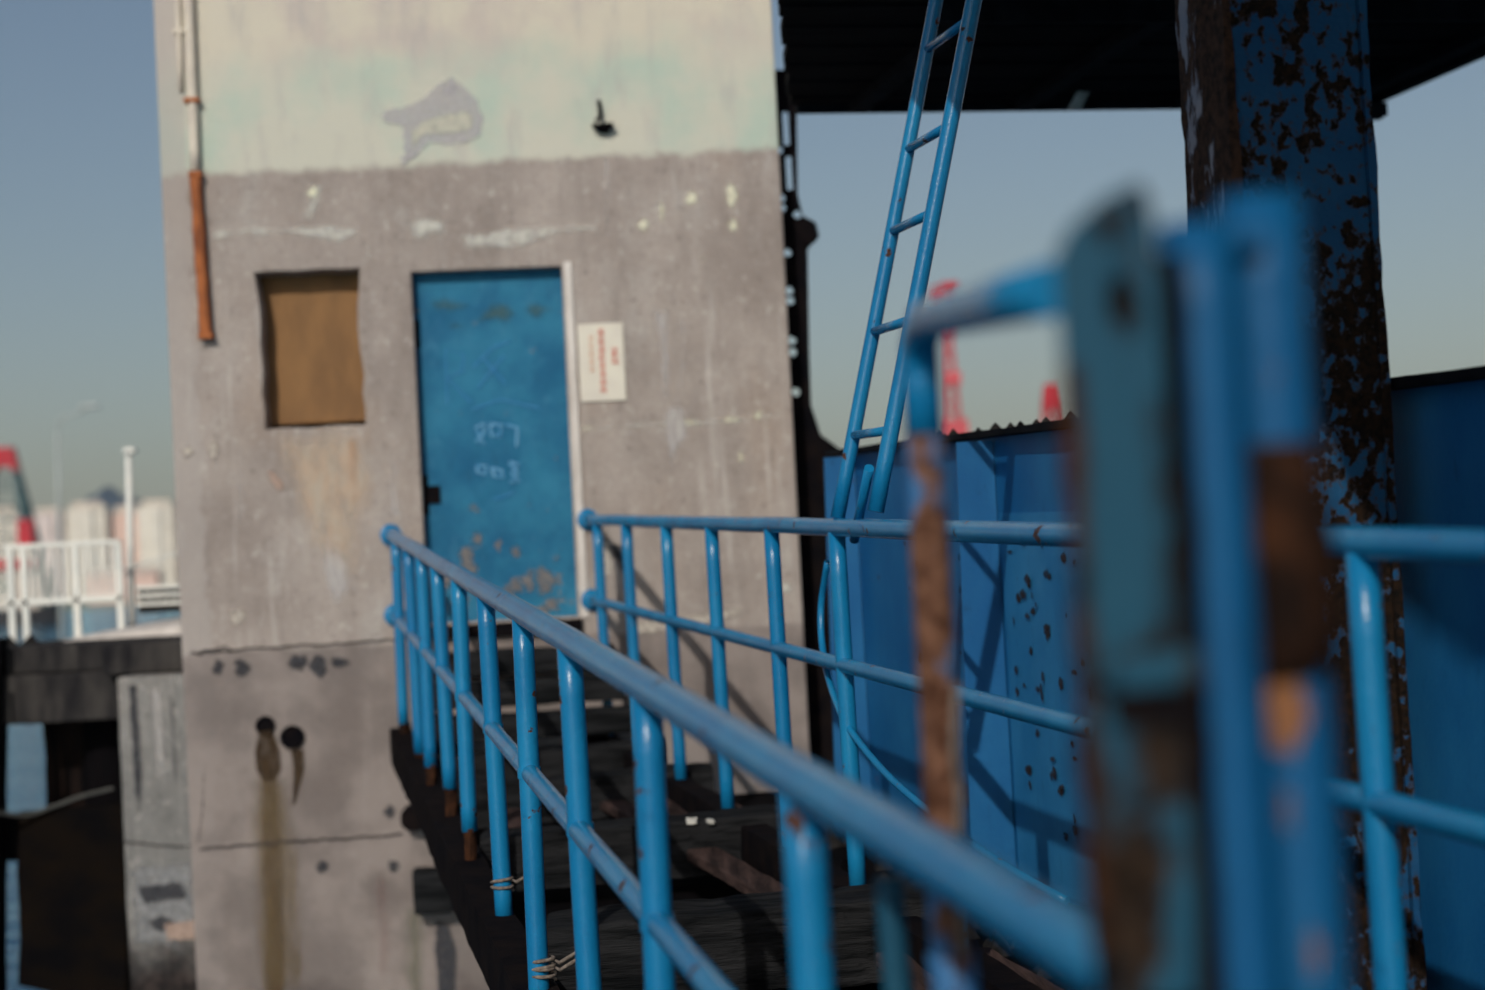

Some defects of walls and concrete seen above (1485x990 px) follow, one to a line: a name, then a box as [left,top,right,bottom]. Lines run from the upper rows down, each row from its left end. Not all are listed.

peeling [445,533,481,589]
peeling [507,557,557,612]